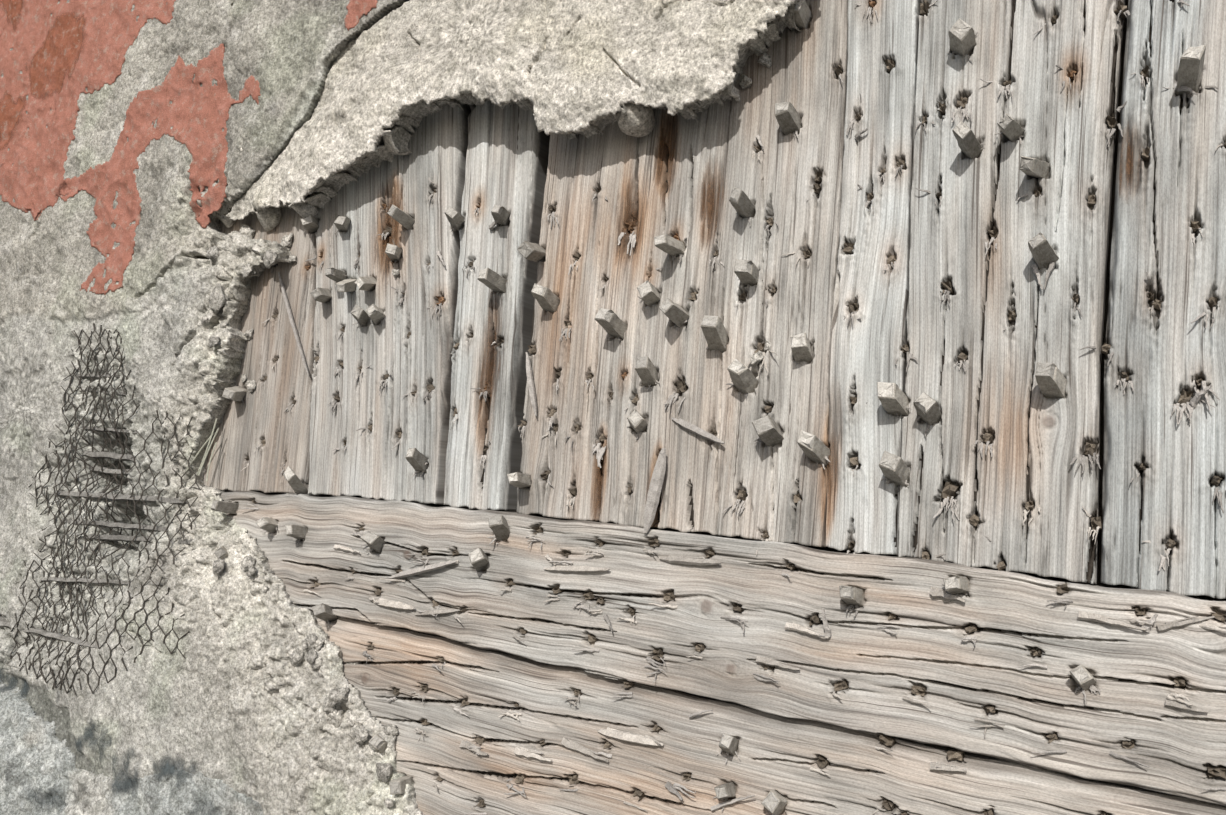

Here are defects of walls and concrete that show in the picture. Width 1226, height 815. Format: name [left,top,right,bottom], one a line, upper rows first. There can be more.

peeling [0,0,261,295]
peeling [344,0,378,31]
flaking render [0,327,197,670]